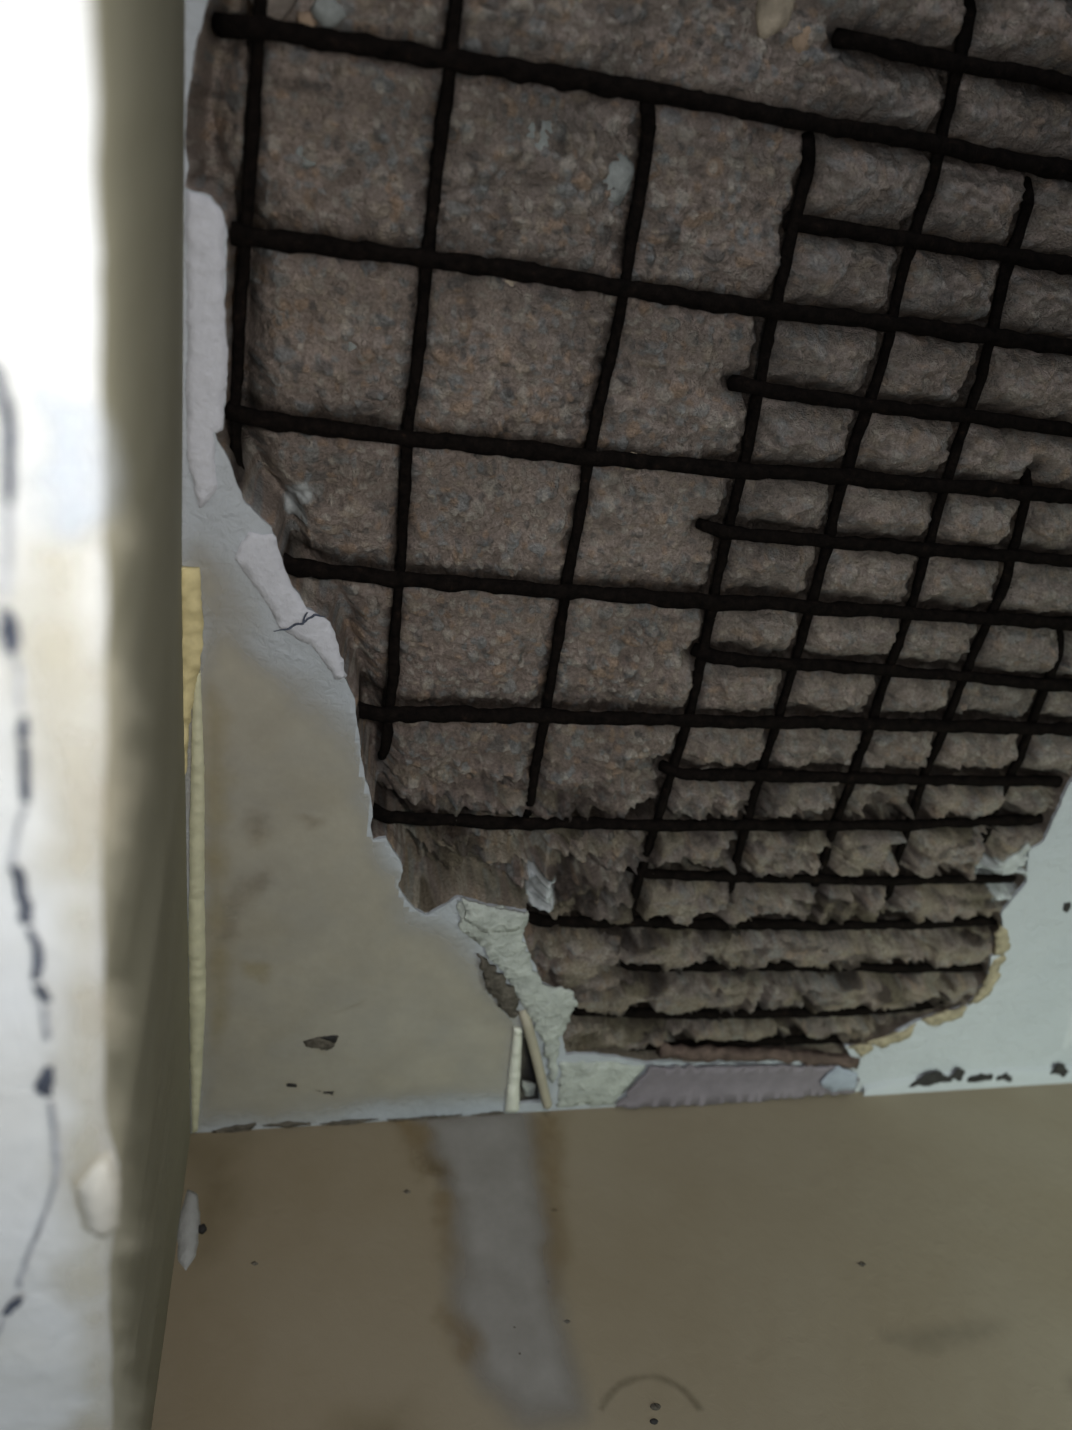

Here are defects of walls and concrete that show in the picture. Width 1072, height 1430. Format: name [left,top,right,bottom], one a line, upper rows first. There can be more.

crack [0,368,61,1333]
peeling [212,1111,505,1133]
spalling [182,0,1072,1109]